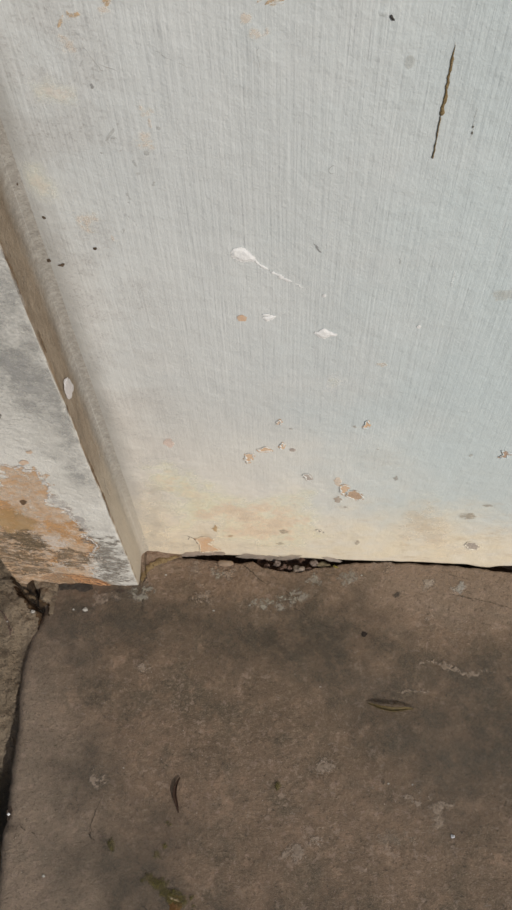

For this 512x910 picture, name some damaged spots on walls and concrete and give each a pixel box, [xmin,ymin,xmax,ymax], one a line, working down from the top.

peeling [64,377,74,416]
peeling [334,478,364,503]
peeling [0,451,125,593]
crack [140,536,328,627]
crack [332,559,512,607]